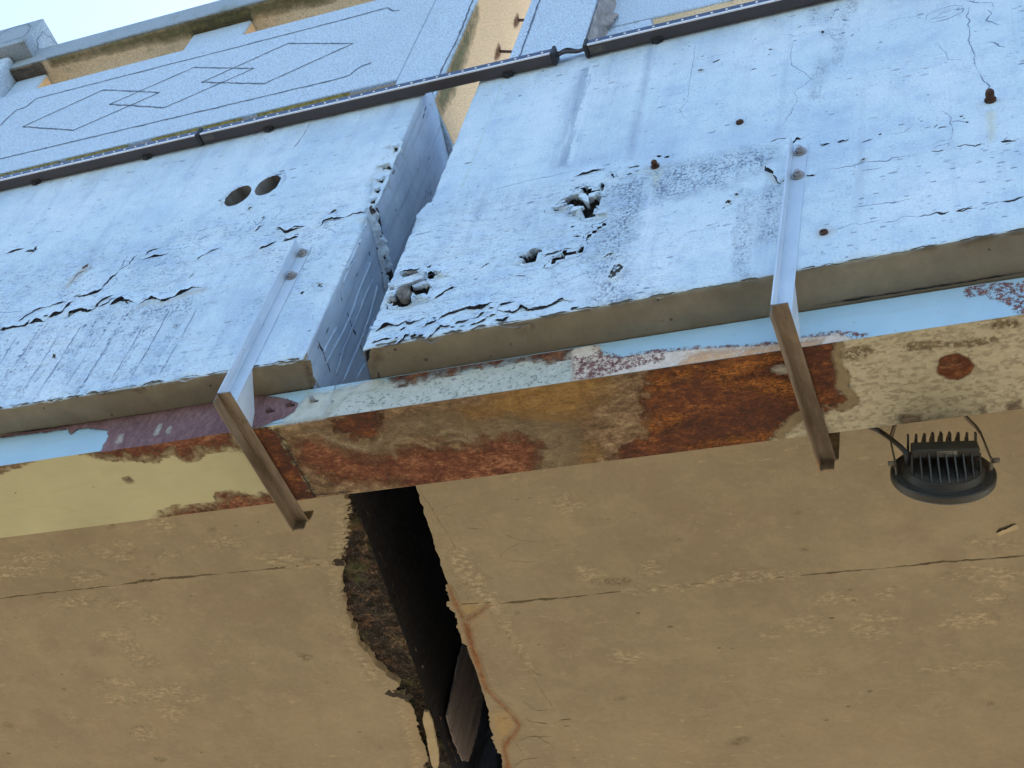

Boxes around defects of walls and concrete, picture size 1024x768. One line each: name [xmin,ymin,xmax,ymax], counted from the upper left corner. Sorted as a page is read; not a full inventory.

crack [751,32,1015,184]
crack [0,227,221,331]
crack [251,206,367,249]
spalling [366,140,784,346]
crack [838,196,1024,229]
peeling [0,402,230,452]
peeling [252,395,298,428]
corrosion [253,342,803,500]
corrosion [801,331,874,412]
corrosion [906,281,1024,380]
crack [757,523,1024,579]
corrosion [445,584,525,768]